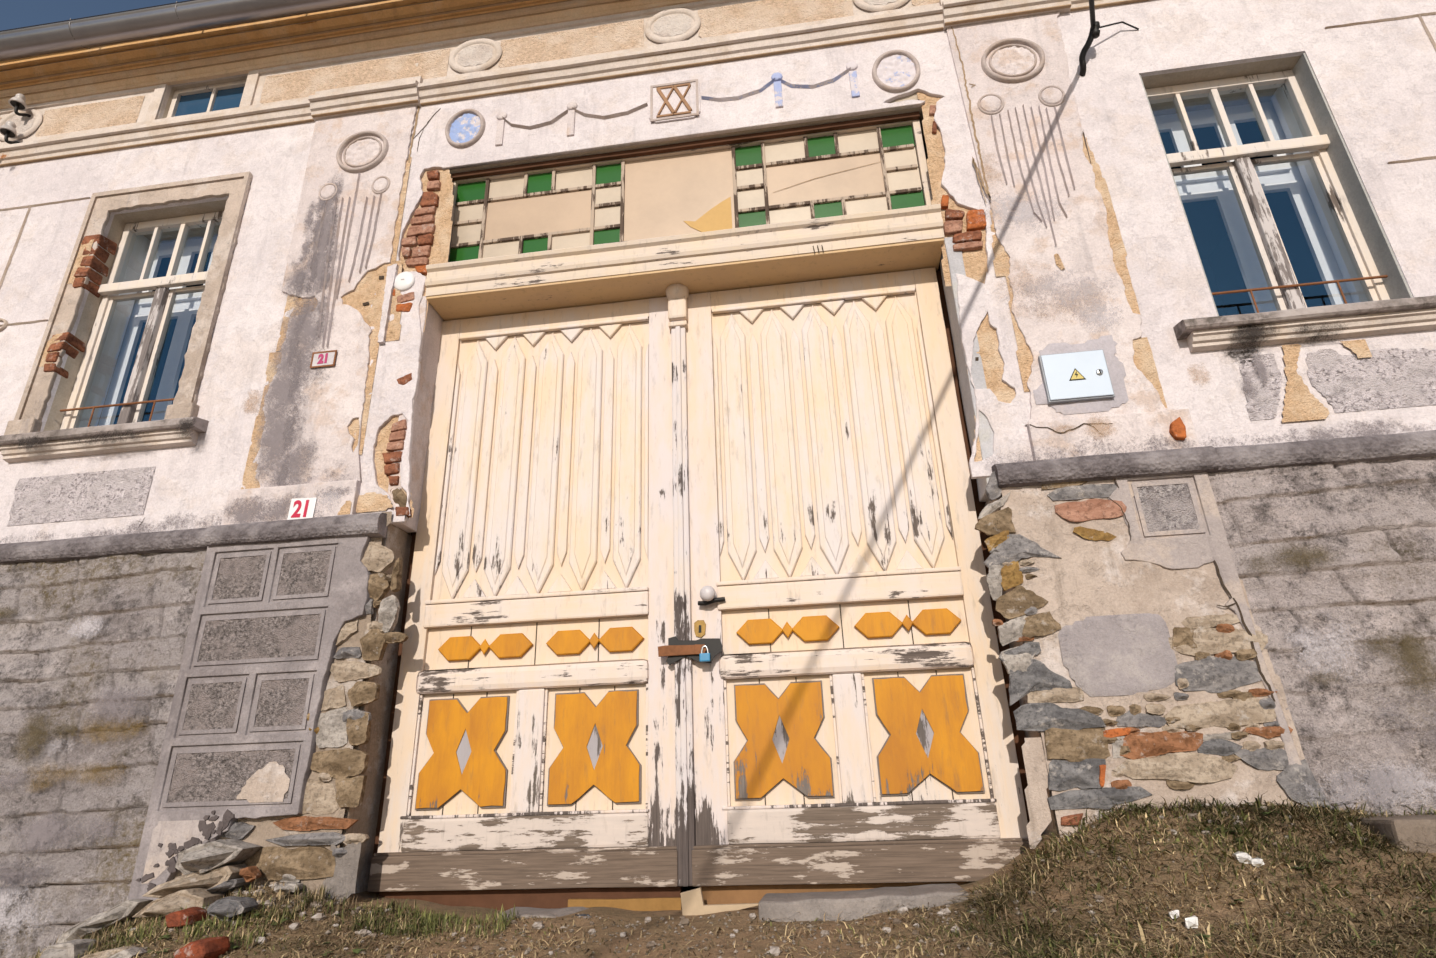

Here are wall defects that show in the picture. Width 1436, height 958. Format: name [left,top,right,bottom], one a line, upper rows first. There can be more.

spalling [39,332,85,378]
spalling [67,234,117,298]
leakage [284,180,342,445]
flaking render [917,92,1033,403]
flaking render [1133,337,1187,441]
leakage [1227,323,1276,396]
flaking render [1282,344,1330,422]
leakage [1295,323,1348,342]
spalling [136,157,454,895]
spalling [973,416,1333,838]